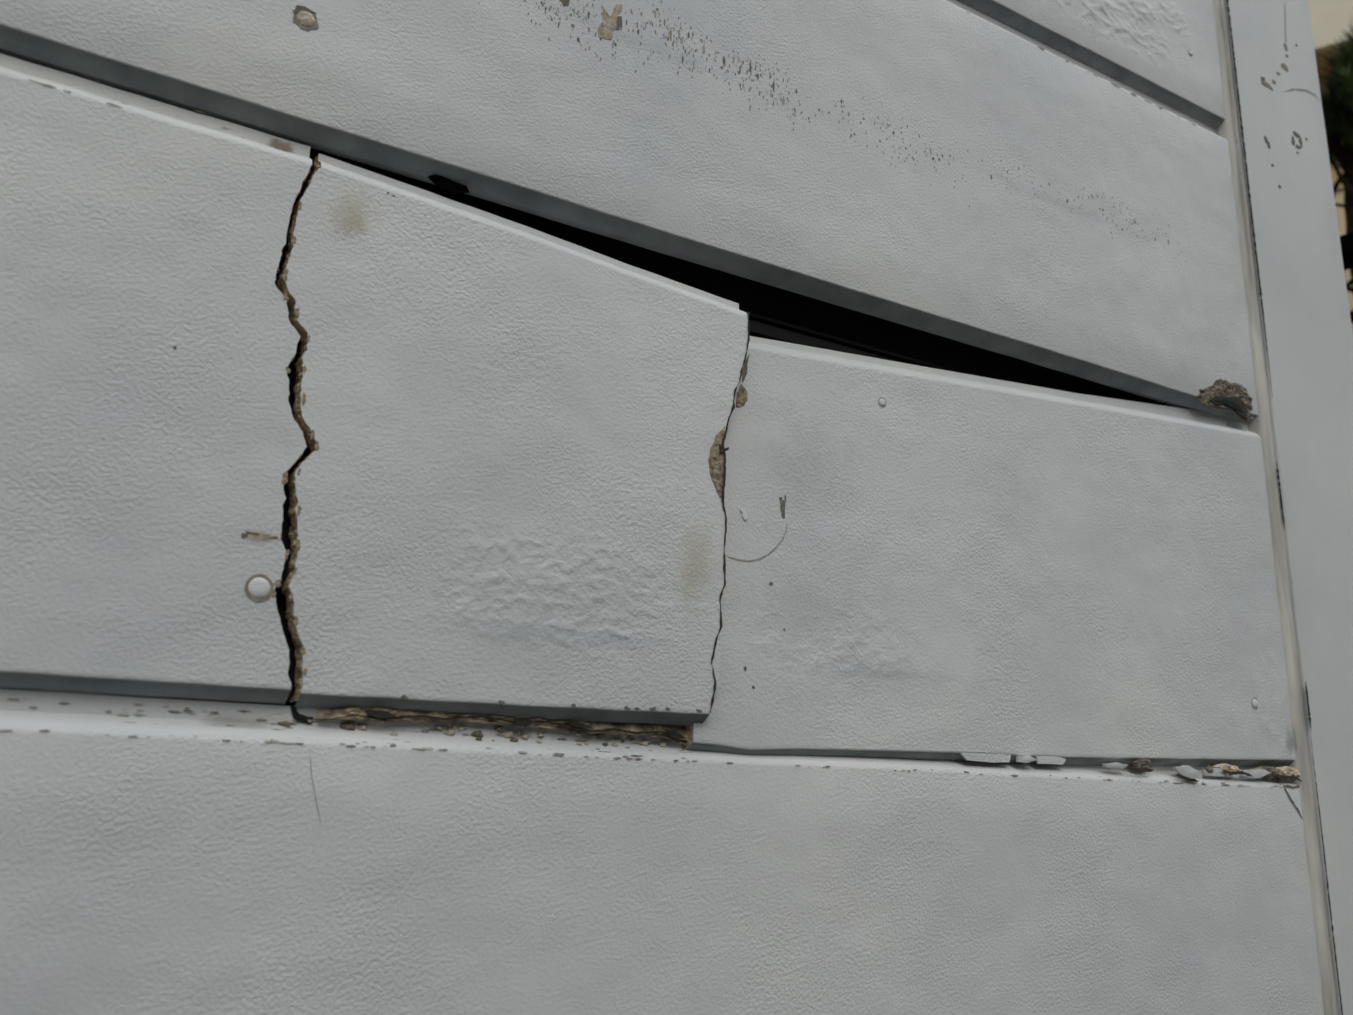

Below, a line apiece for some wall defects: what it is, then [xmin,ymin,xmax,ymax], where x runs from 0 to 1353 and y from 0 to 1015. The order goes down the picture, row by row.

damp [271,140,292,151]
peeling [520,0,1182,265]
crack [725,311,750,439]
spalling [1196,379,1254,423]
crack [272,154,322,826]
crack [684,492,787,747]
spalling [164,694,698,762]